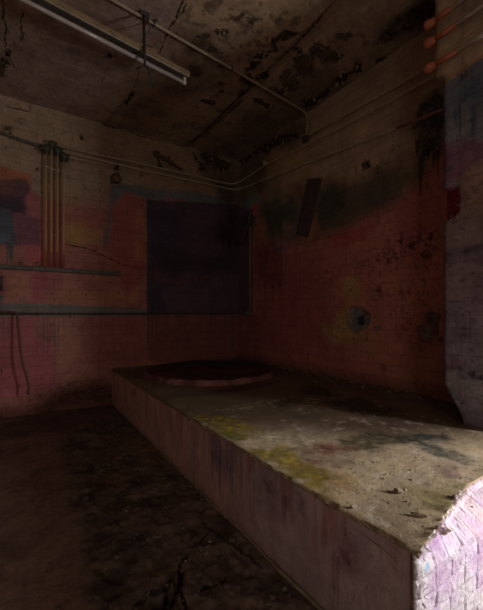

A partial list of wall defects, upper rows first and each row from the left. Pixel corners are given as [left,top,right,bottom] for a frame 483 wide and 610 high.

crack [2,0,24,71]
crack [102,0,336,147]
crack [132,518,262,610]
spalling [420,490,465,554]